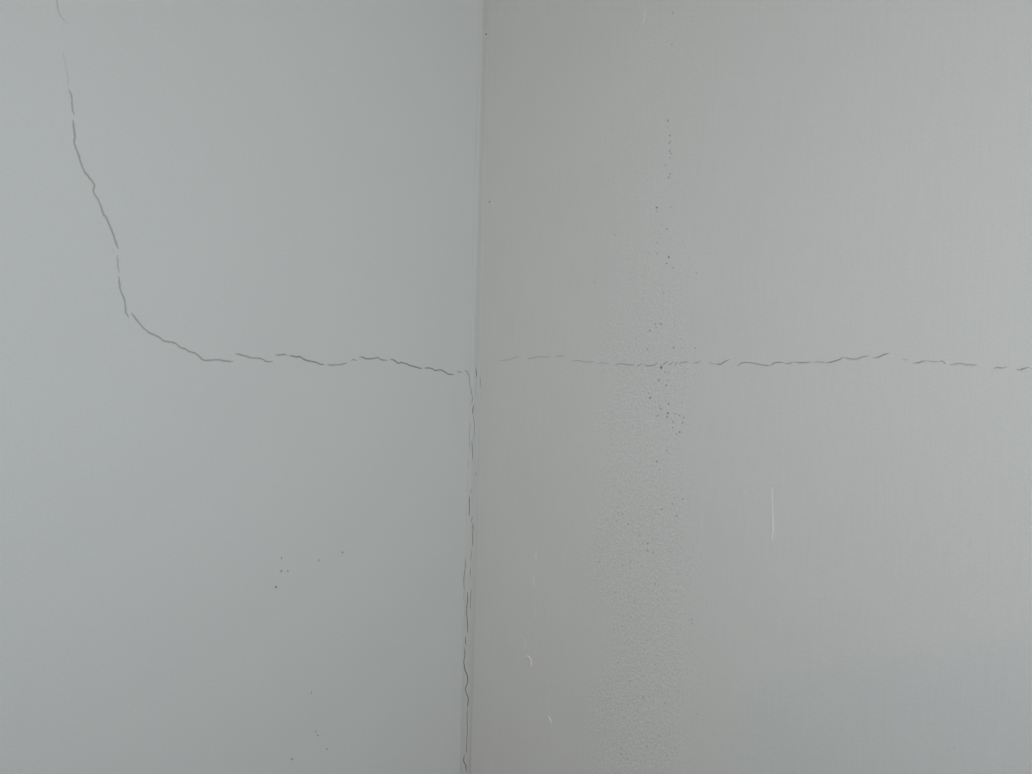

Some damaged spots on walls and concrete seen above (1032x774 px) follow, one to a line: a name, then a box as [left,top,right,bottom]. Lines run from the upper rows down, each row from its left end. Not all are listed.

crack [61,50,481,772]
crack [497,352,1032,372]